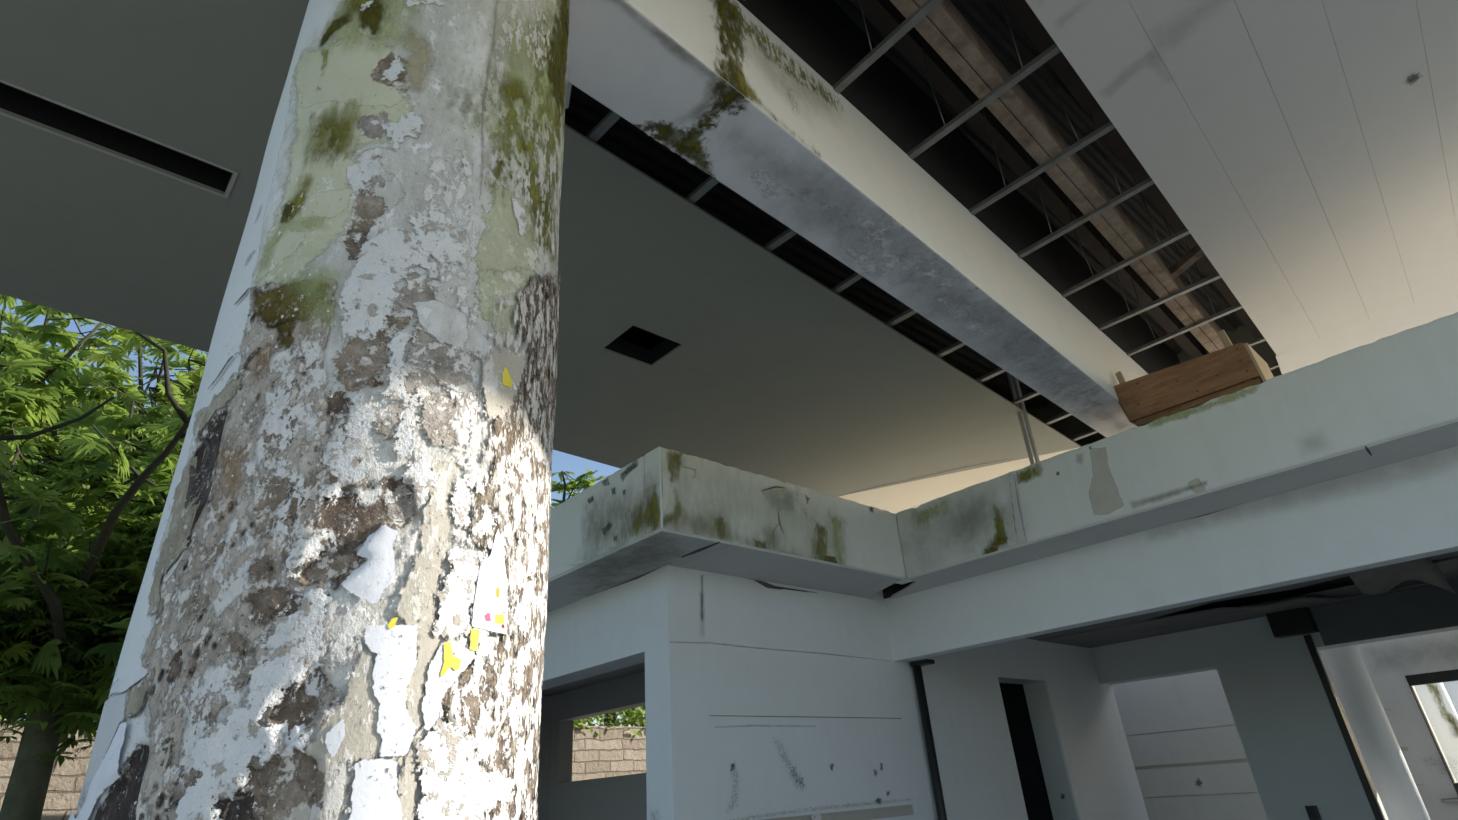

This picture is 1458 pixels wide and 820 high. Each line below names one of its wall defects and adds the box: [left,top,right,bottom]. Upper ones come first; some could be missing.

damp [320,2,382,71]
damp [503,81,522,99]
damp [735,68,761,103]
damp [645,128,704,165]
damp [280,204,293,223]
damp [497,159,548,243]
peeling [68,0,565,820]
peeling [1089,447,1123,515]
damp [633,493,660,533]
damp [818,518,842,563]